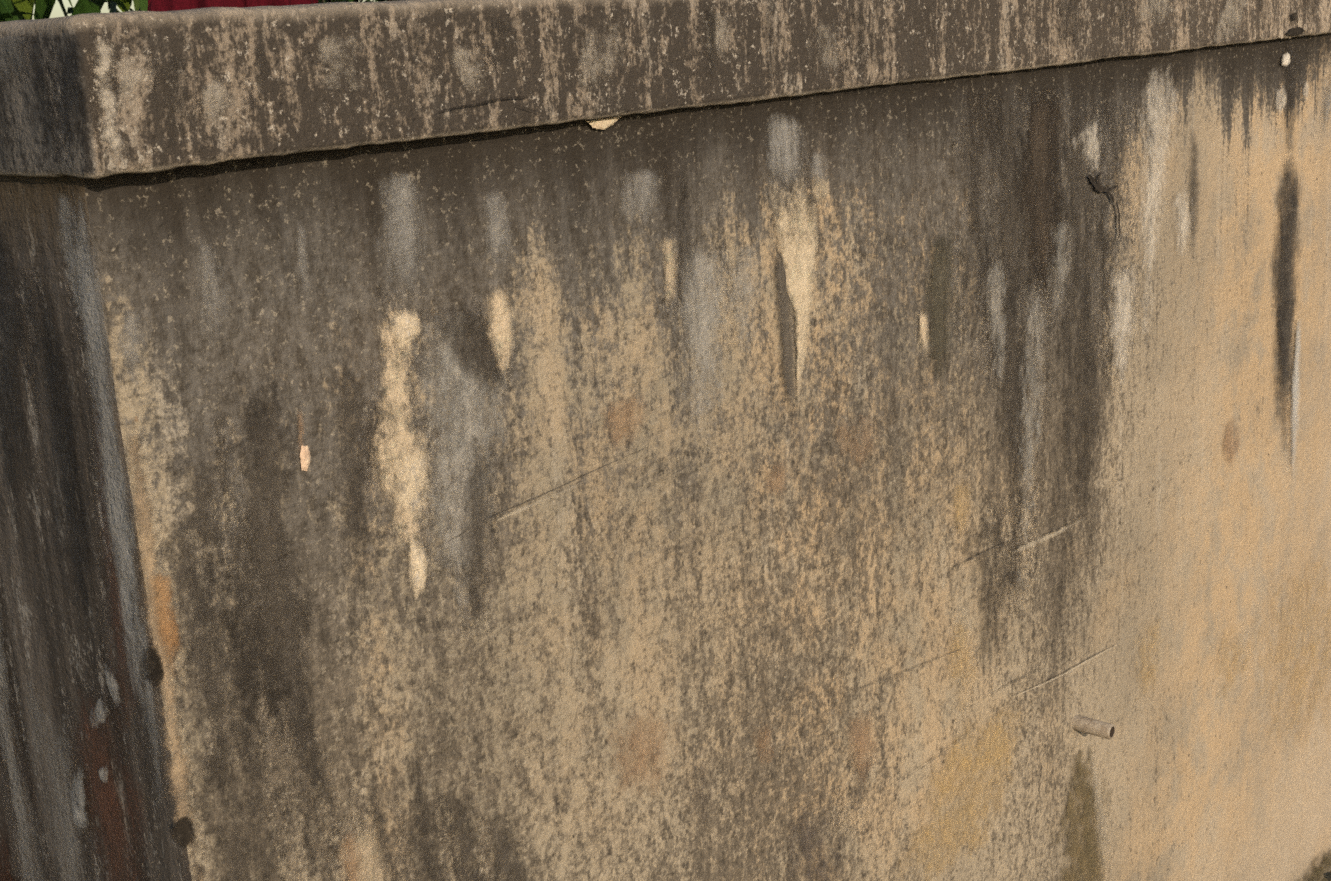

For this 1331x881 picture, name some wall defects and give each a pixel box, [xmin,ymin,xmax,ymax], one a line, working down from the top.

damp [0,238,88,602]
damp [65,210,158,744]
damp [389,178,414,268]
damp [666,174,752,412]
damp [776,254,794,401]
damp [809,194,822,250]
damp [920,236,952,371]
damp [968,98,1130,653]
damp [1142,84,1173,267]
damp [1177,144,1198,236]
damp [1275,164,1300,464]
damp [0,626,34,880]